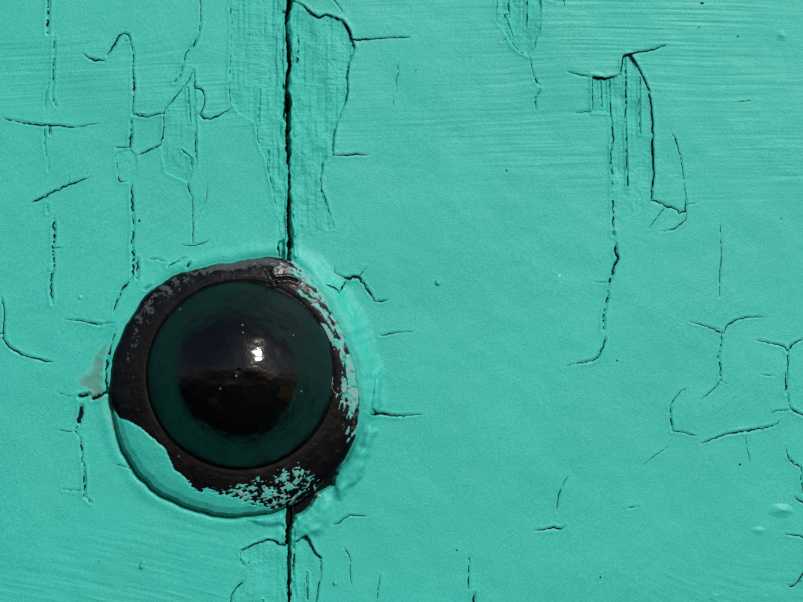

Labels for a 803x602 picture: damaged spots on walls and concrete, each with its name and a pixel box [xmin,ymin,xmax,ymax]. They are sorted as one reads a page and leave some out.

crack [4,0,91,156]
crack [649,134,694,231]
crack [0,301,51,362]
crack [33,177,90,298]
crack [60,1,231,502]
crack [262,238,296,283]
crack [326,267,386,302]
crack [568,180,619,366]
crack [370,410,423,418]
crack [670,316,803,461]
spalling [285,471,336,525]